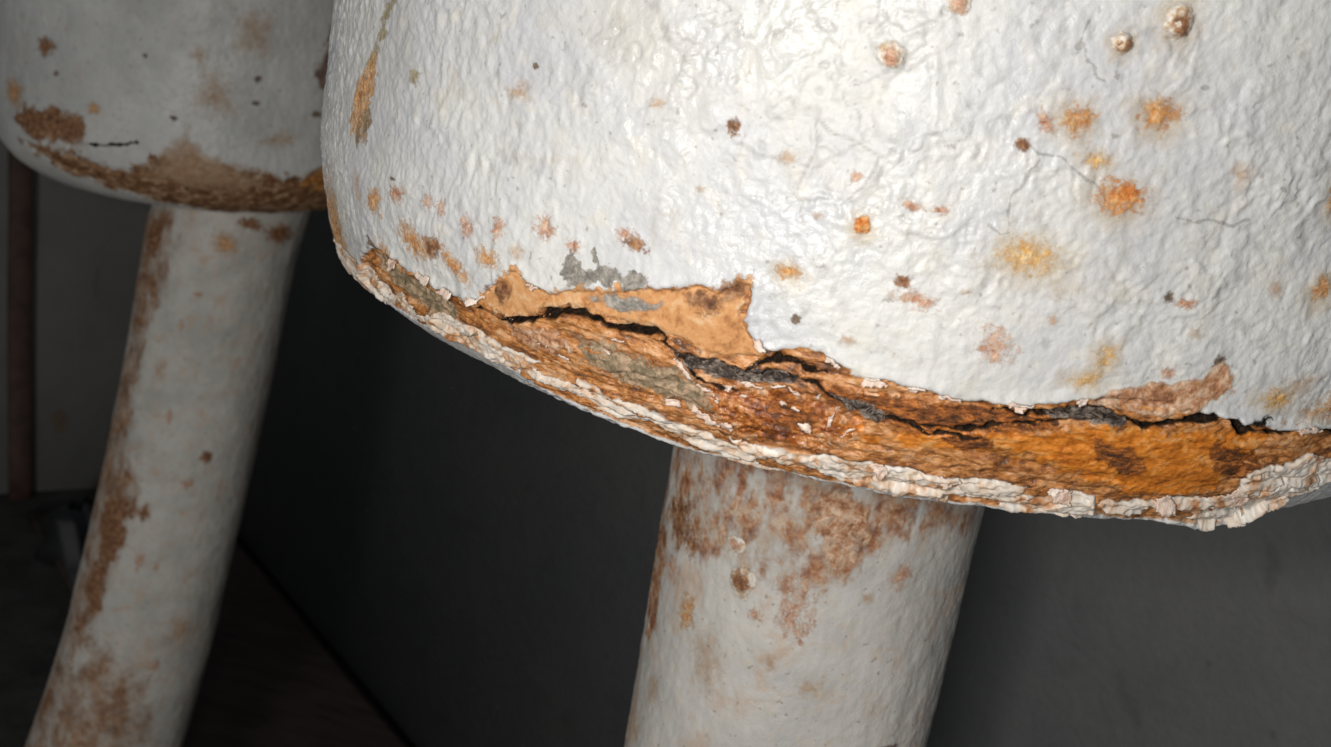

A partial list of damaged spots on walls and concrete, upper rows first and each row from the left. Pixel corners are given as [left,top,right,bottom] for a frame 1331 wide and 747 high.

corrosion [314,26,331,89]
corrosion [349,0,396,147]
corrosion [1015,138,1029,152]
corrosion [1036,103,1097,138]
corrosion [1086,153,1146,217]
corrosion [379,216,470,290]
corrosion [618,229,650,254]
corrosion [894,276,937,309]
corrosion [6,72,348,747]
peeling [333,235,1331,532]
crack [476,305,1290,441]
corrosion [645,447,976,645]